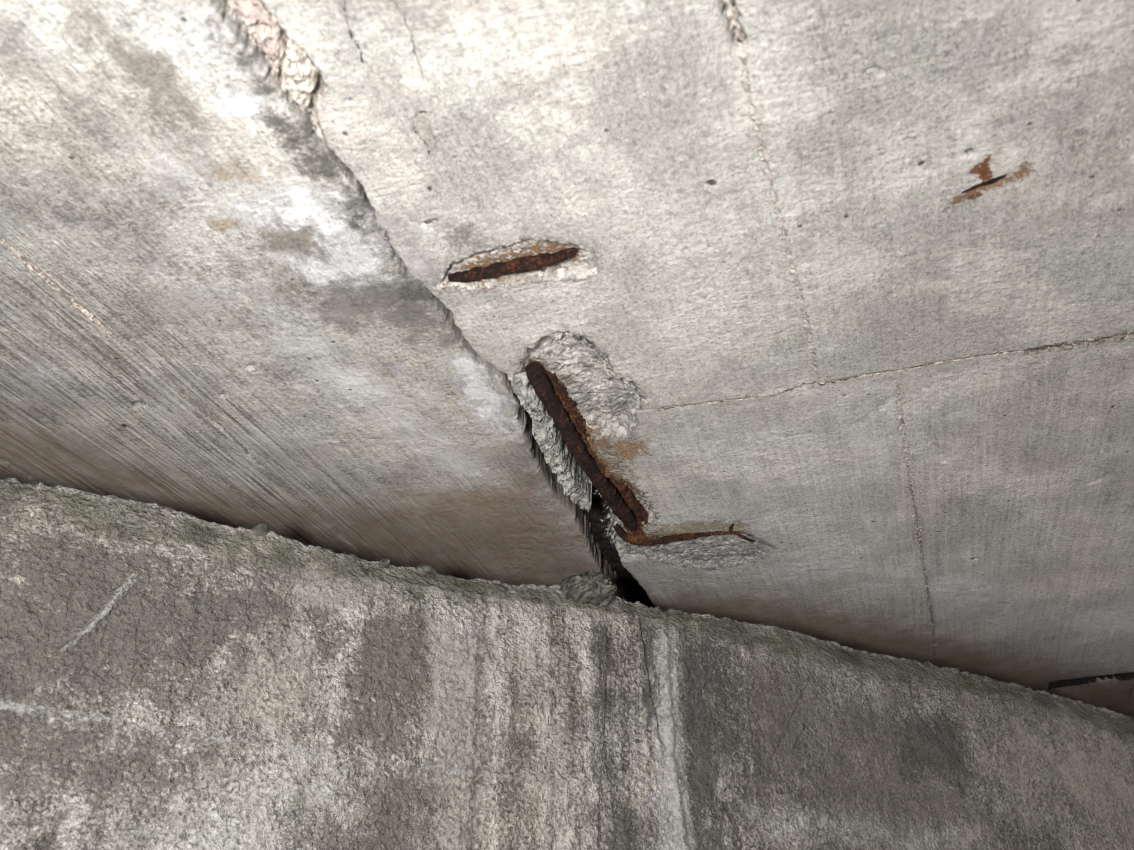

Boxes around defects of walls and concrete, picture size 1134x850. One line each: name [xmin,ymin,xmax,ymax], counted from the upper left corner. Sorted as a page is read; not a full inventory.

crack [343,0,375,74]
crack [391,0,424,82]
crack [395,111,436,188]
rust [946,154,1035,209]
rust [443,240,584,292]
crack [648,0,1134,660]
spalling [519,332,649,457]
rust [514,355,752,548]
spalling [588,472,777,571]
crack [582,482,659,734]
crack [1048,672,1134,698]